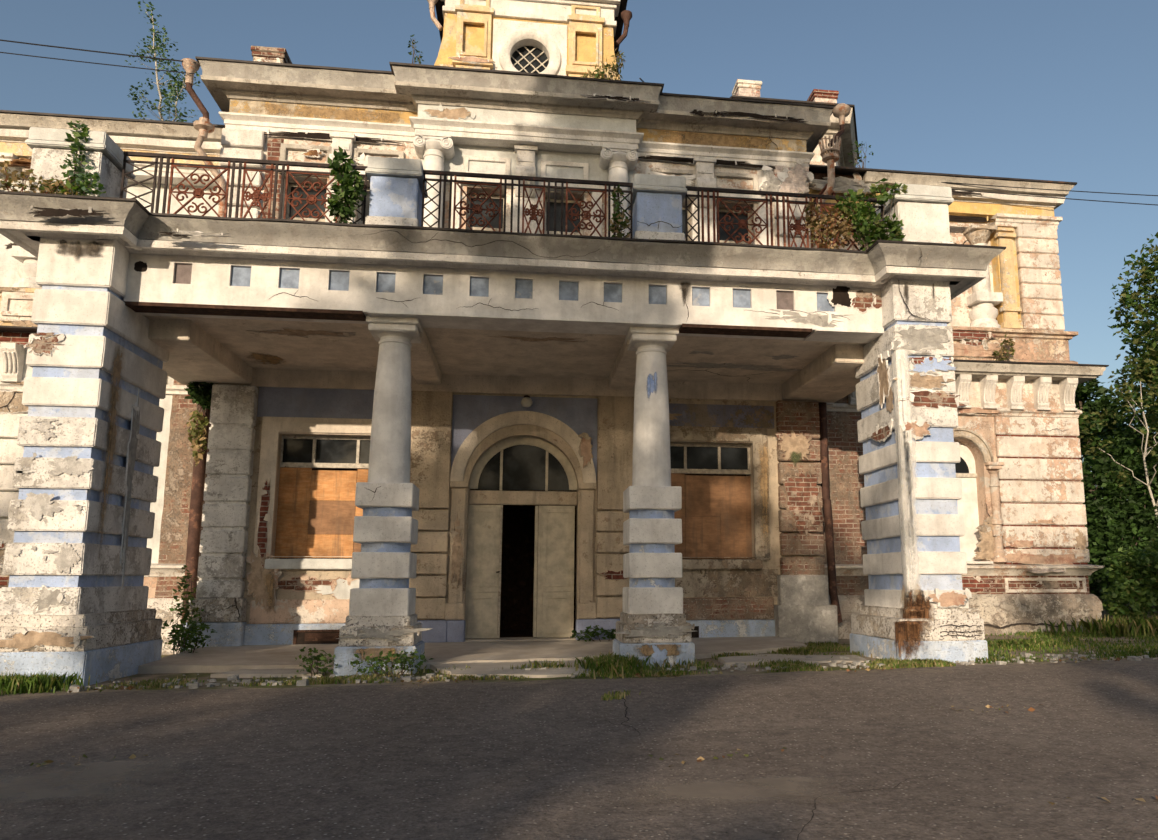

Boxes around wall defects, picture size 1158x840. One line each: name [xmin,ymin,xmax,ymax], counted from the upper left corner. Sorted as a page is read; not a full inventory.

flaking render [3,157,32,169]
peeling [764,287,882,328]
flaking render [11,316,66,357]
flaking render [870,324,1009,443]
flaking render [0,381,61,440]
peeling [13,453,94,477]
peeling [14,492,82,521]
peeling [0,541,80,573]
flaking render [245,479,360,614]
peeling [0,628,96,652]
peeling [31,585,69,613]
rust [895,584,931,655]